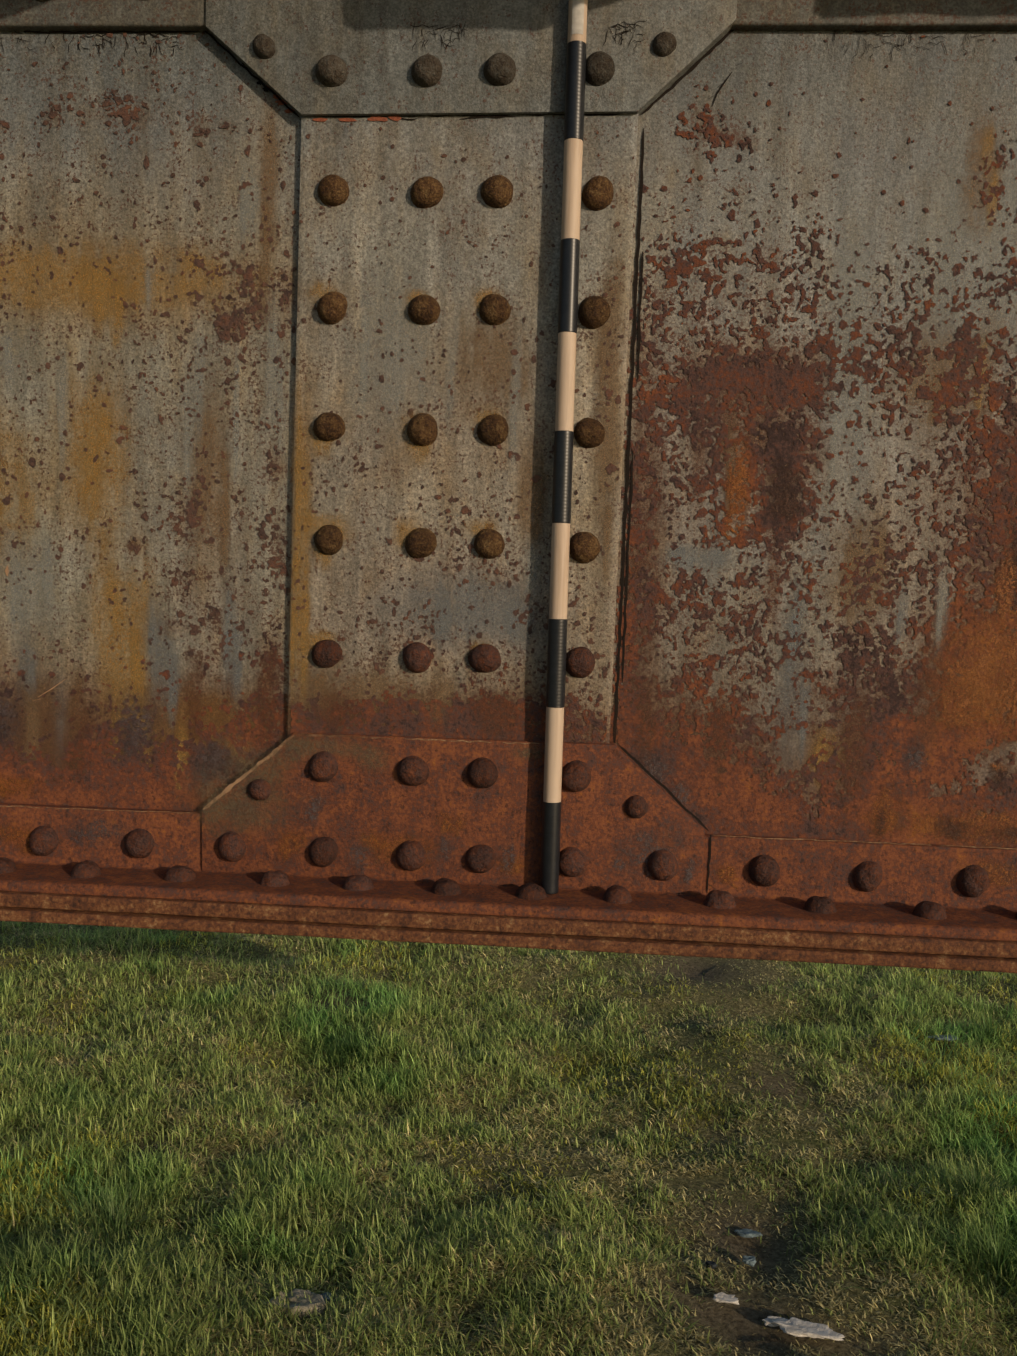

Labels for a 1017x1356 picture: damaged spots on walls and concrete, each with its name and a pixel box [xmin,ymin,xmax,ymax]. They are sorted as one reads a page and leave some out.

rust [196,422,546,799]
rust [633,315,841,573]
rust [836,527,887,612]
rust [887,314,1017,742]
rust [563,688,783,836]